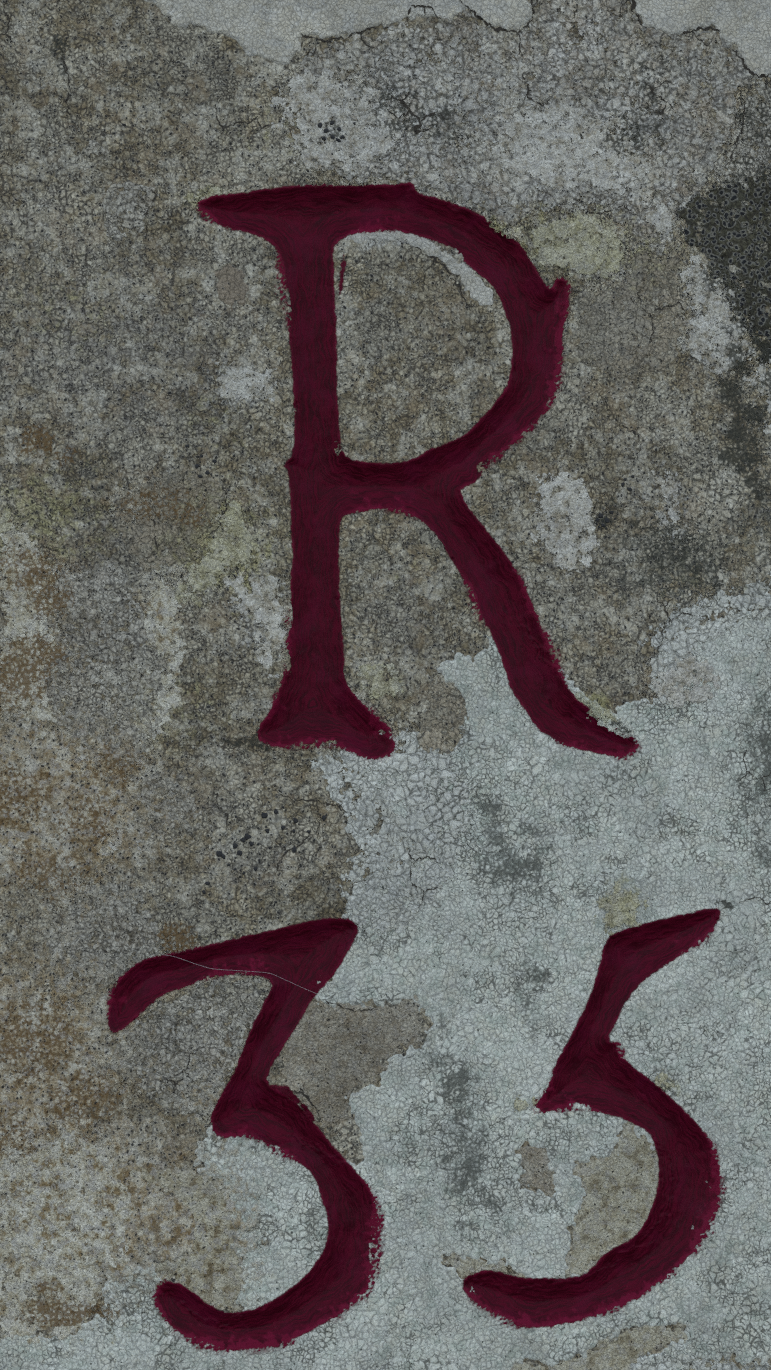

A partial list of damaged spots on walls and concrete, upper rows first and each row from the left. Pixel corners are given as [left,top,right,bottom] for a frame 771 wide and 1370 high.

damp [670,81,771,500]
crack [657,599,695,658]
crack [739,750,771,795]
crack [206,785,228,830]
crack [275,794,352,879]
crack [408,848,442,908]
crack [323,999,376,1012]
crack [294,1088,321,1122]